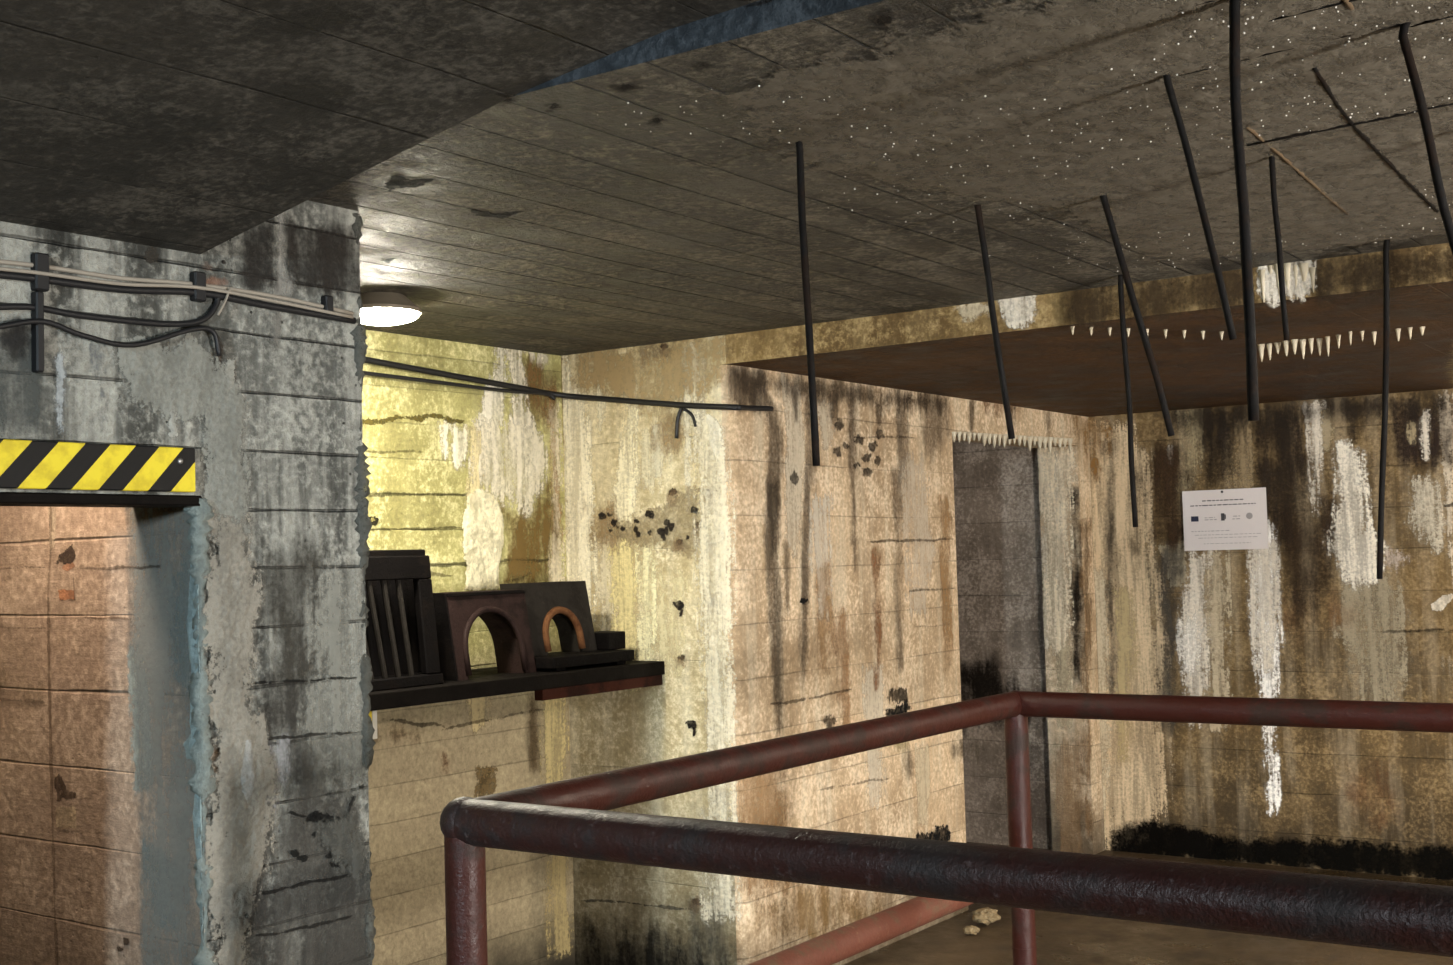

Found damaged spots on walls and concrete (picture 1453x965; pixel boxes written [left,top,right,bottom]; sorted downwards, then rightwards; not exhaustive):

spalling [702,0,1453,261]
damp [1063,251,1453,331]
damp [439,342,738,752]
spalling [598,485,712,558]
damp [729,366,947,730]
spalling [833,418,885,477]
damp [1037,344,1453,702]
damp [247,542,367,965]
damp [701,781,738,822]
damp [960,659,1019,701]
damp [1100,720,1453,880]
damp [700,872,741,924]